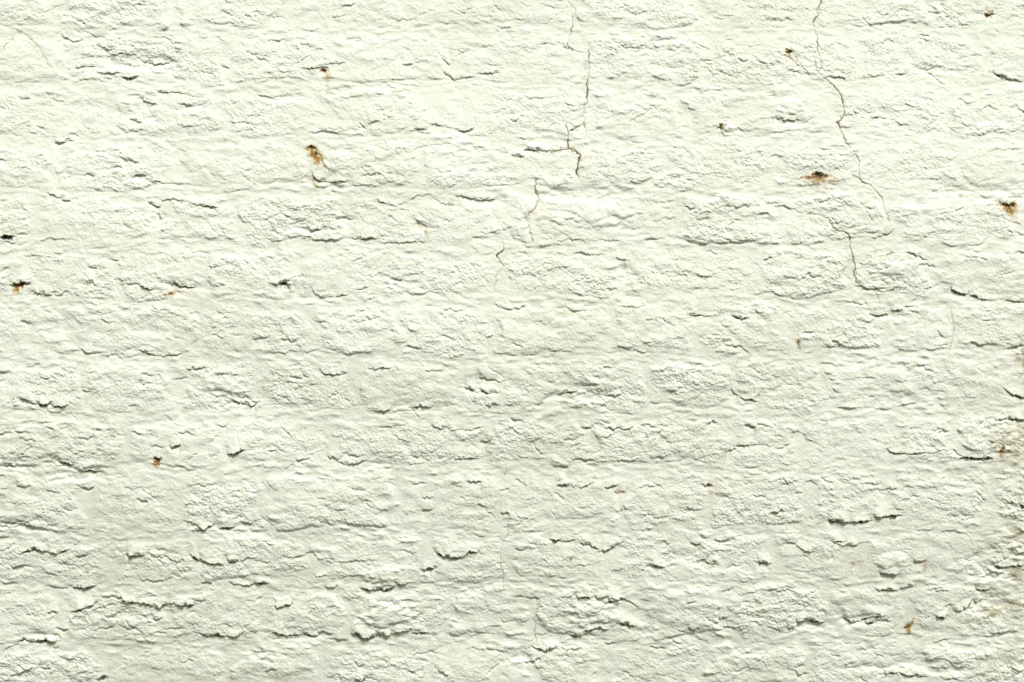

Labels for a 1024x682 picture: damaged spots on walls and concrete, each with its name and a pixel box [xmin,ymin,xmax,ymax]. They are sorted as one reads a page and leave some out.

crack [565,24,590,177]
crack [808,213,897,290]